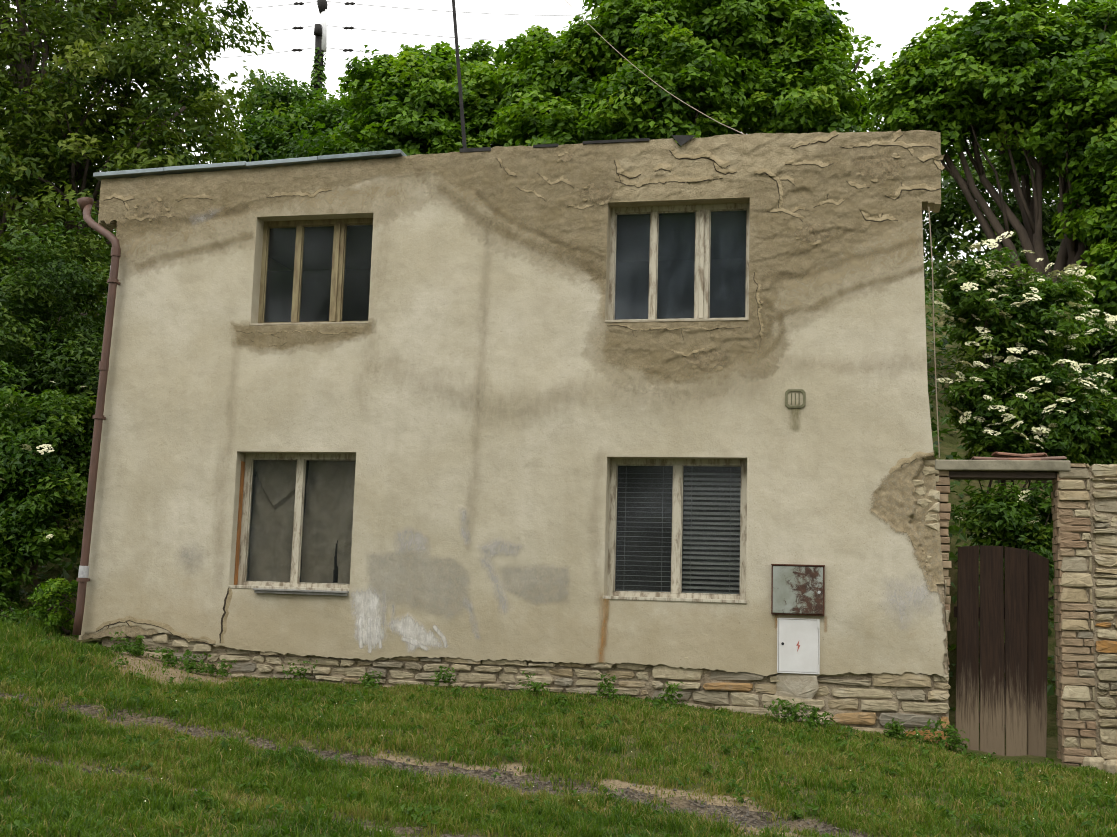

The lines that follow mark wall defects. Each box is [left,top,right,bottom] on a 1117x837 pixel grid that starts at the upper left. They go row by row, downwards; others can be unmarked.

spalling [852,148,906,184]
spalling [871,454,950,675]
crack [96,588,233,645]